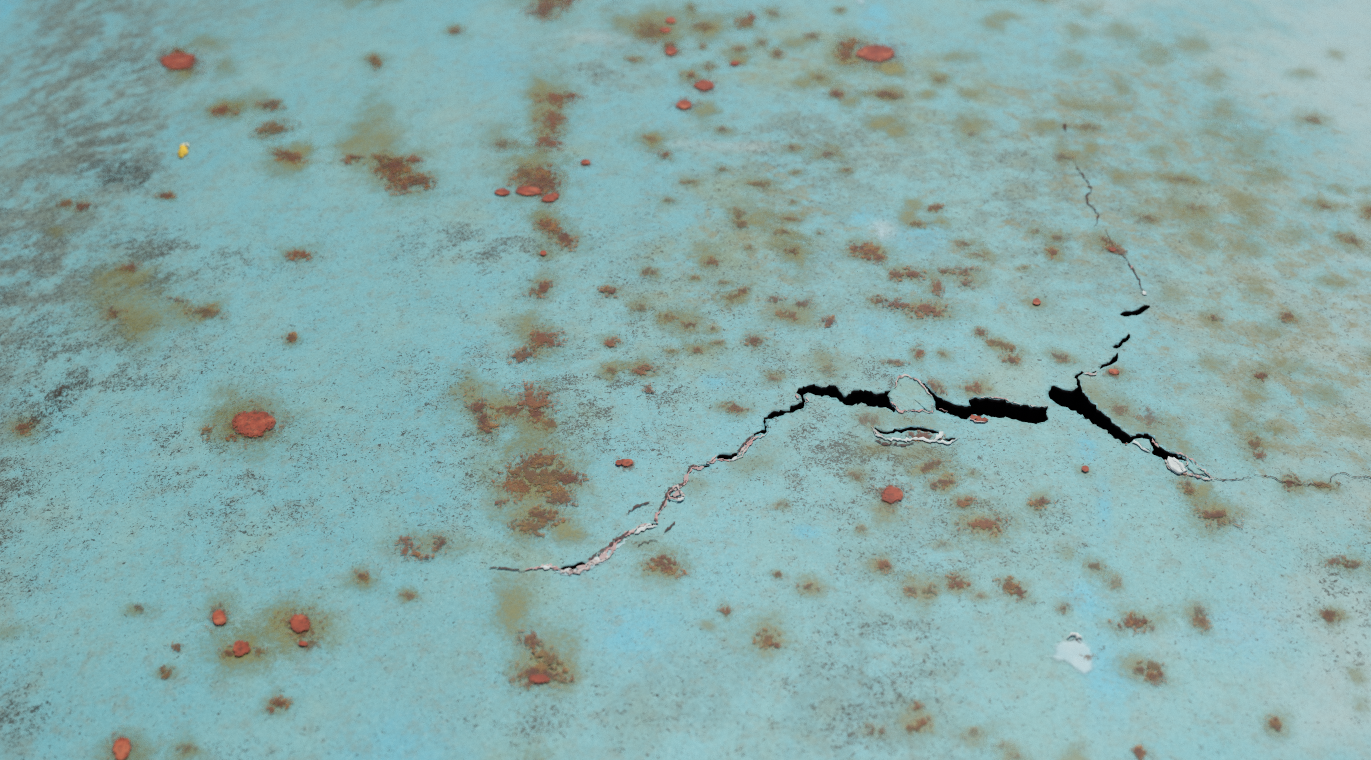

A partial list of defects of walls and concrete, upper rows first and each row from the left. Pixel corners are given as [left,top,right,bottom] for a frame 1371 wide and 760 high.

corrosion [520,0,578,22]
corrosion [340,105,438,195]
corrosion [494,79,588,251]
crack [490,123,1371,575]
corrosion [459,318,593,540]
corrosion [215,602,332,668]
peeling [1054,632,1092,673]
corrosion [1131,744,1148,760]